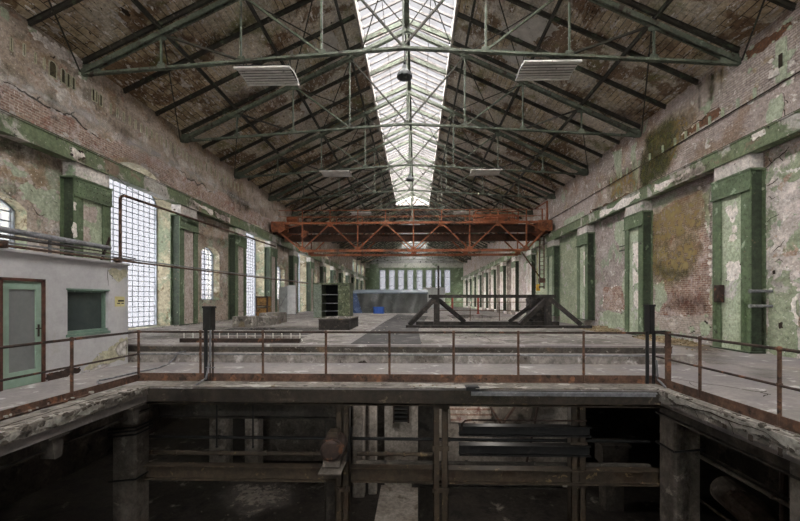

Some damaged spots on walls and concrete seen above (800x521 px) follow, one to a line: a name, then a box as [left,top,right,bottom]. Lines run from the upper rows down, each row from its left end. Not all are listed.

spalling [744,17,793,61]
crack [3,81,100,139]
spalling [0,80,273,234]
peeling [653,168,690,192]
peeling [71,202,98,242]
peeling [590,192,640,217]
peeling [725,205,738,242]
peeling [725,260,741,281]
spalling [0,388,149,446]
spalling [660,391,800,454]